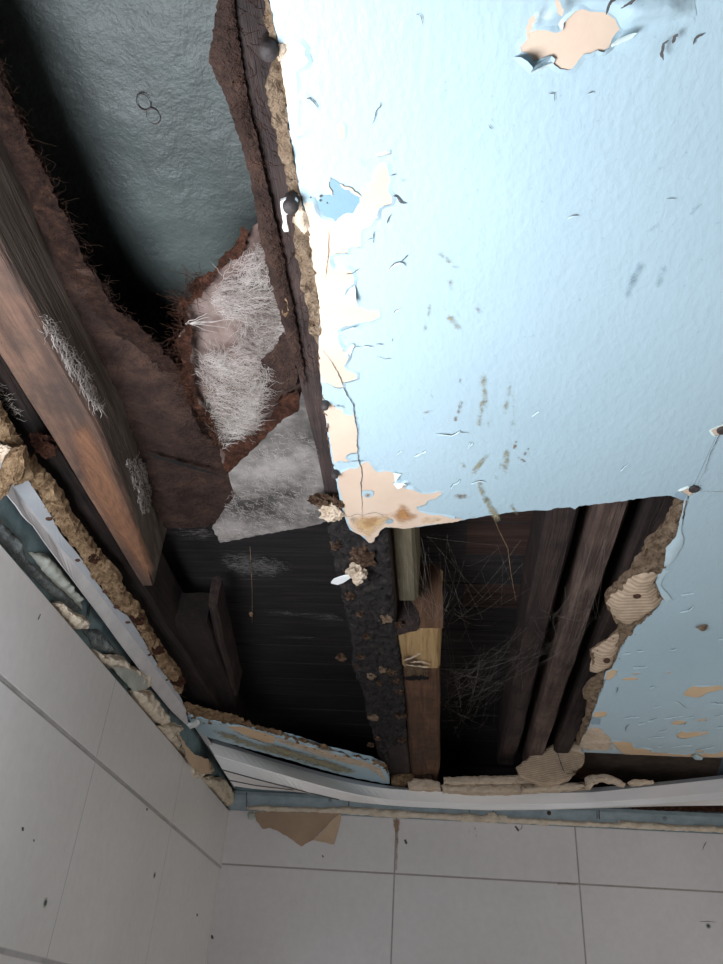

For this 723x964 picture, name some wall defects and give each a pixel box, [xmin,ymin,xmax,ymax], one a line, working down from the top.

peeling [513,5,637,75]
peeling [263,0,463,543]
crack [323,351,385,519]
spalling [576,486,695,745]
peeling [611,740,723,760]
peeling [682,685,723,698]